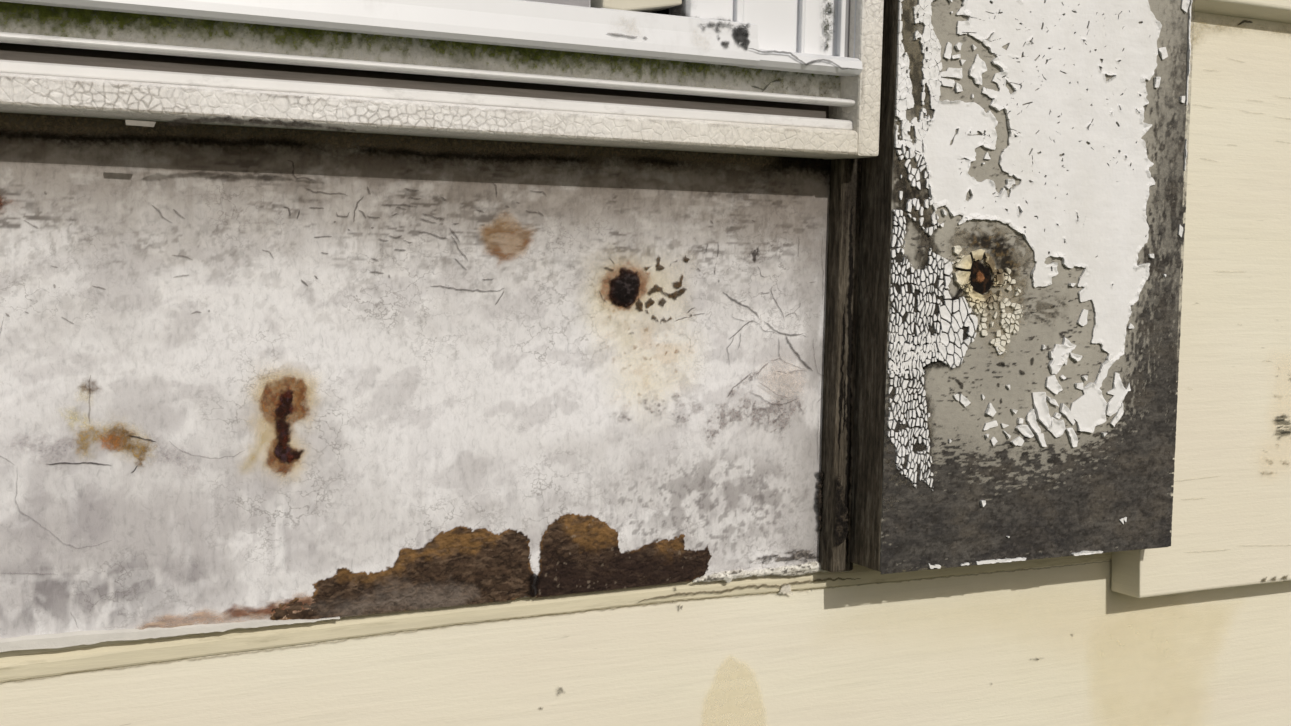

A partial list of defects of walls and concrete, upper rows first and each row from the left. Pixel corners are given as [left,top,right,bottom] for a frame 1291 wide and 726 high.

water stain [701,20,750,49]
water stain [823,3,833,50]
peeling [1179,0,1193,105]
corrosion [484,221,531,259]
peeling [894,0,1168,447]
corrosion [599,256,705,322]
corrosion [41,424,156,473]
corrosion [261,377,308,474]
peeling [0,513,712,652]
peeling [960,557,1026,566]